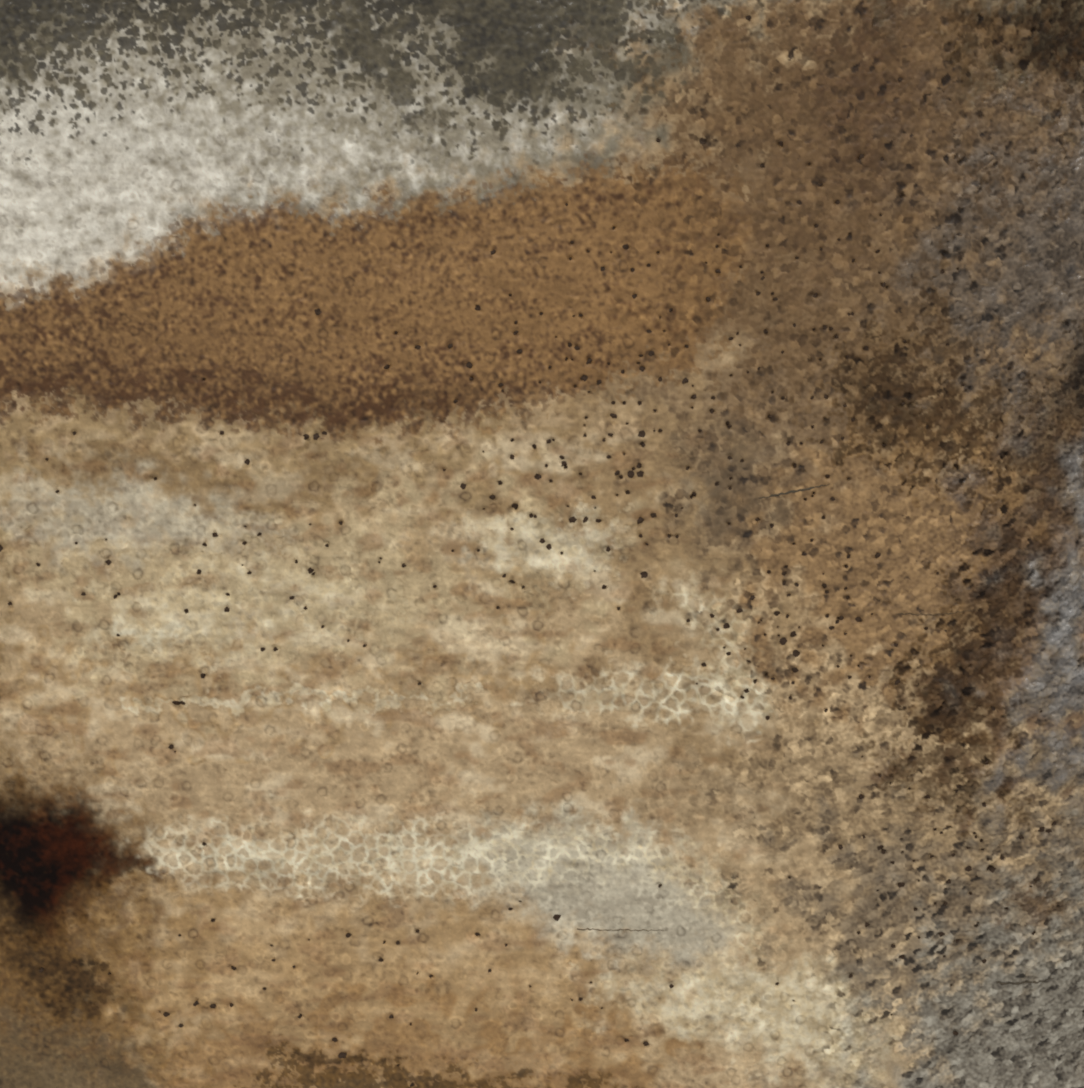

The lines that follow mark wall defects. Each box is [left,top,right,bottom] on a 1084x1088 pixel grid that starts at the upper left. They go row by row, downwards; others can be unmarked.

leakage [0,0,1084,837]
corrosion [0,774,168,1023]